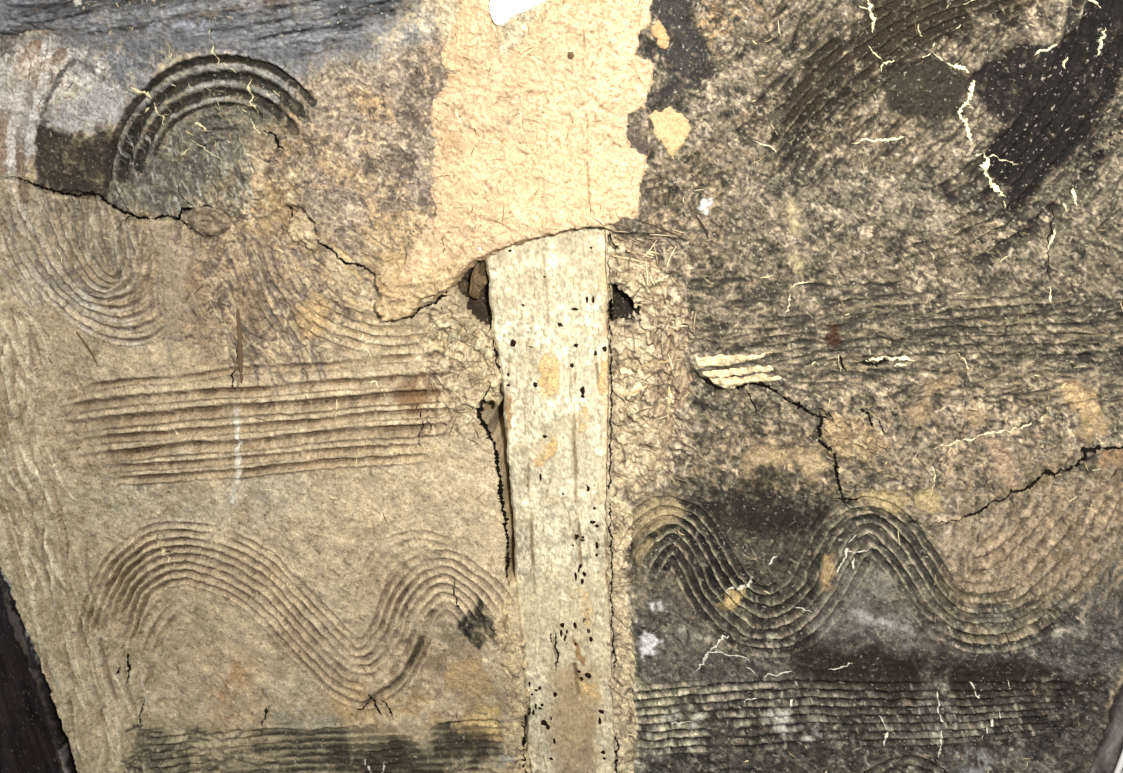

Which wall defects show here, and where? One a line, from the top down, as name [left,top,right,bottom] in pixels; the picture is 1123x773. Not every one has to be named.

crack [11,176,231,231]
crack [287,205,370,271]
crack [472,337,511,586]
crack [695,369,863,501]
crack [860,408,885,435]
crack [931,402,1050,492]
crack [927,444,1123,527]
spalling [444,576,532,773]